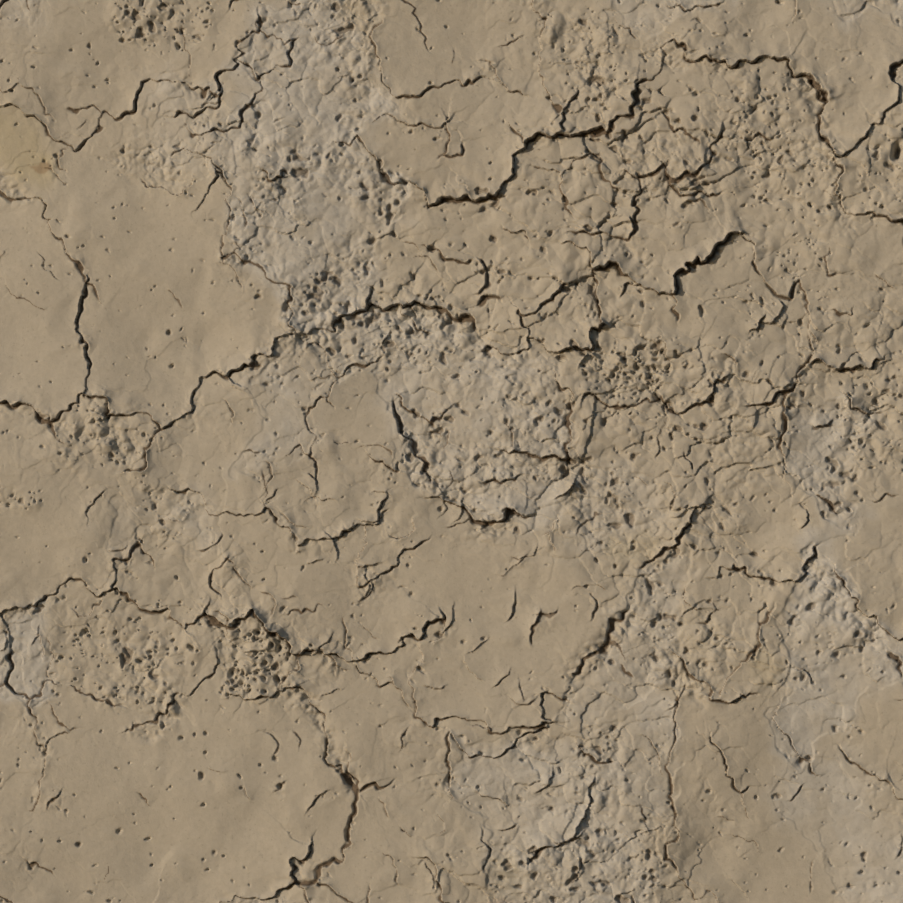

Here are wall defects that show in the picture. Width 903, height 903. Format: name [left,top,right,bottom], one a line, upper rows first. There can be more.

spalling [2,607,198,708]
crack [0,527,637,903]
peeling [131,0,716,903]
crack [0,0,903,591]
crack [639,487,903,903]
peeling [765,556,903,903]